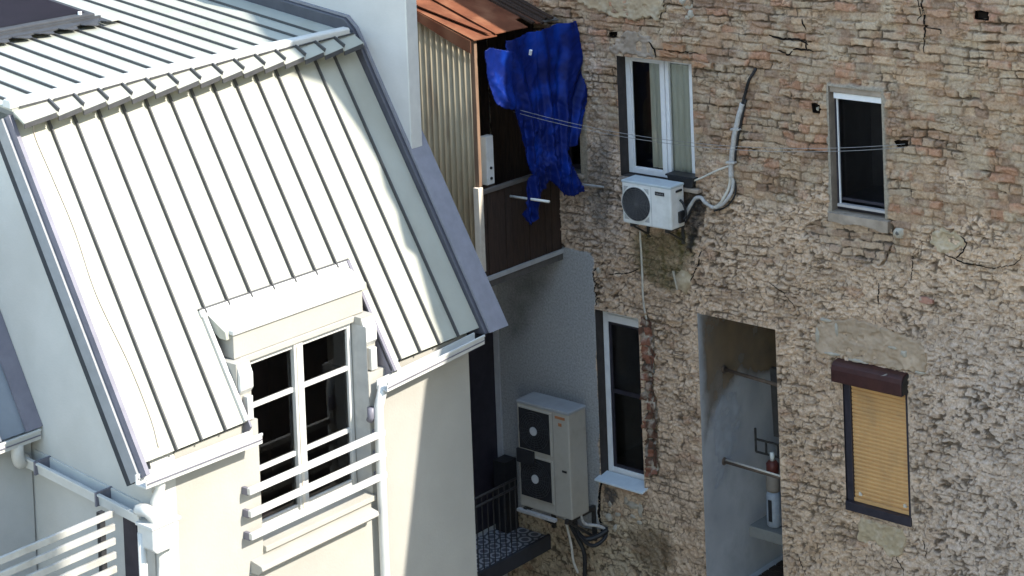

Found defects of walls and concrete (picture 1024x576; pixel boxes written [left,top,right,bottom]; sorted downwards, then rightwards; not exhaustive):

crack [917,0,942,52]
leakage [636,187,706,289]
crack [945,236,1022,269]
spalling [638,317,659,477]